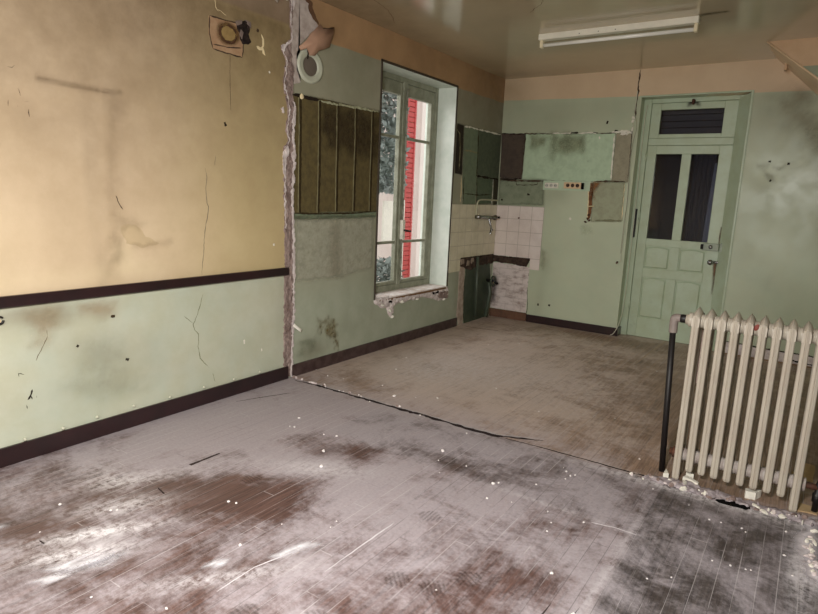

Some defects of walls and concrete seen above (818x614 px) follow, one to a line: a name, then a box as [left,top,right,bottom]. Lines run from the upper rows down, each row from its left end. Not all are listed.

flaking render [281,0,318,84]
peeling [282,102,296,176]
flaking render [374,254,530,325]
crack [184,295,215,380]